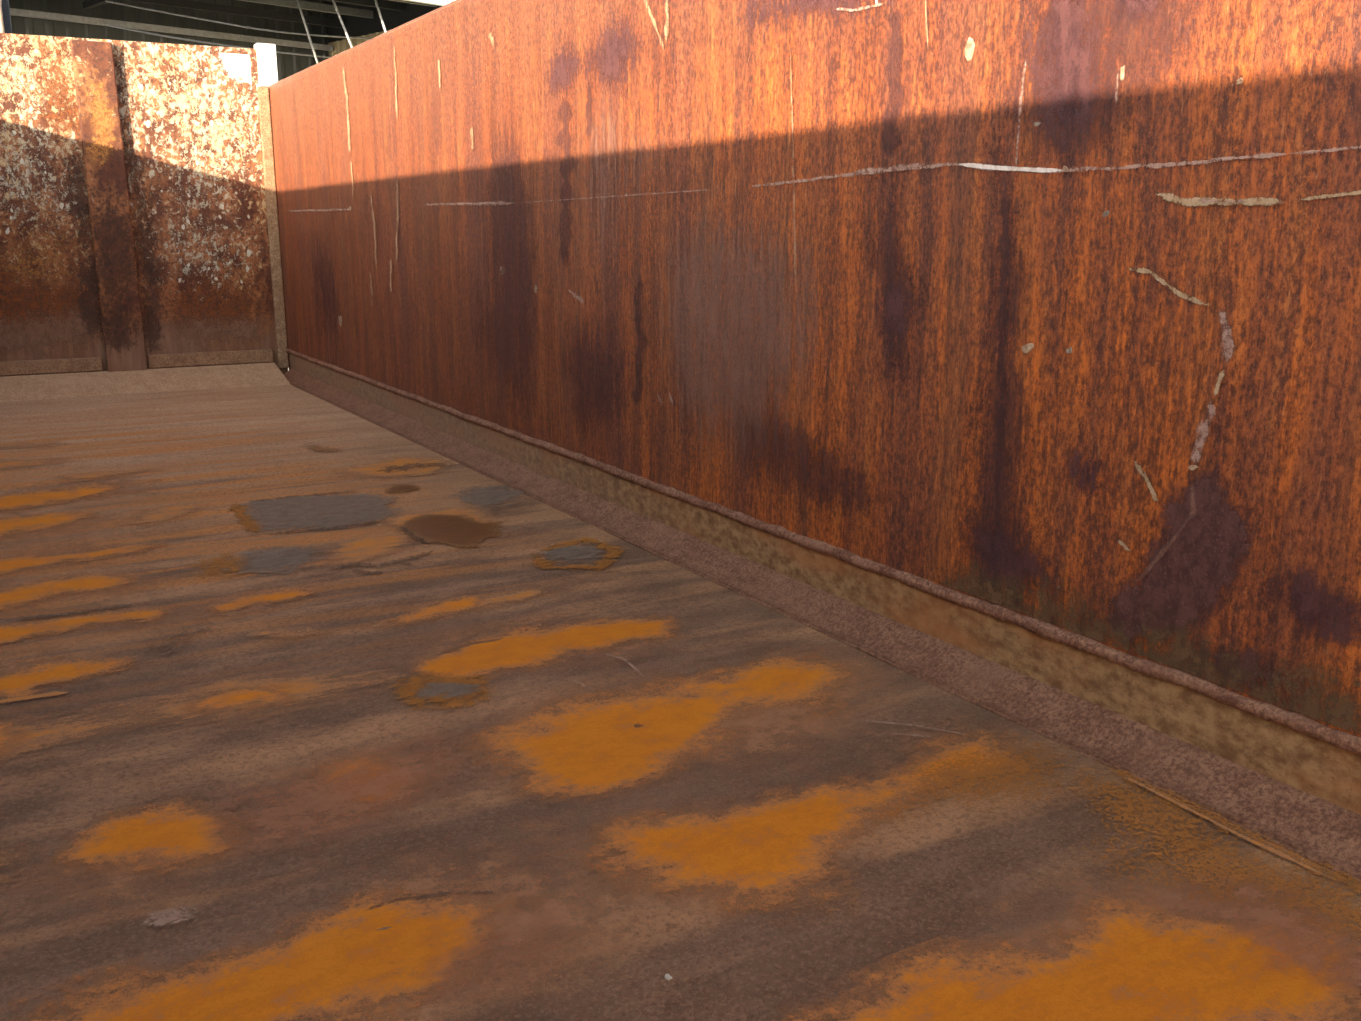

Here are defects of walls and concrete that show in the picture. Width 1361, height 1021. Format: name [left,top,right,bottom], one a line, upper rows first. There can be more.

corrosion [22,41,164,352]
corrosion [548,15,676,264]
corrosion [740,0,904,154]
leakage [855,163,923,173]
leakage [191,483,524,578]
corrosion [337,456,453,478]
corrosion [325,503,504,565]
corrosion [1106,471,1253,644]
leakage [928,564,1361,735]
corrosion [0,588,1030,1021]
corrosion [783,763,1361,1021]